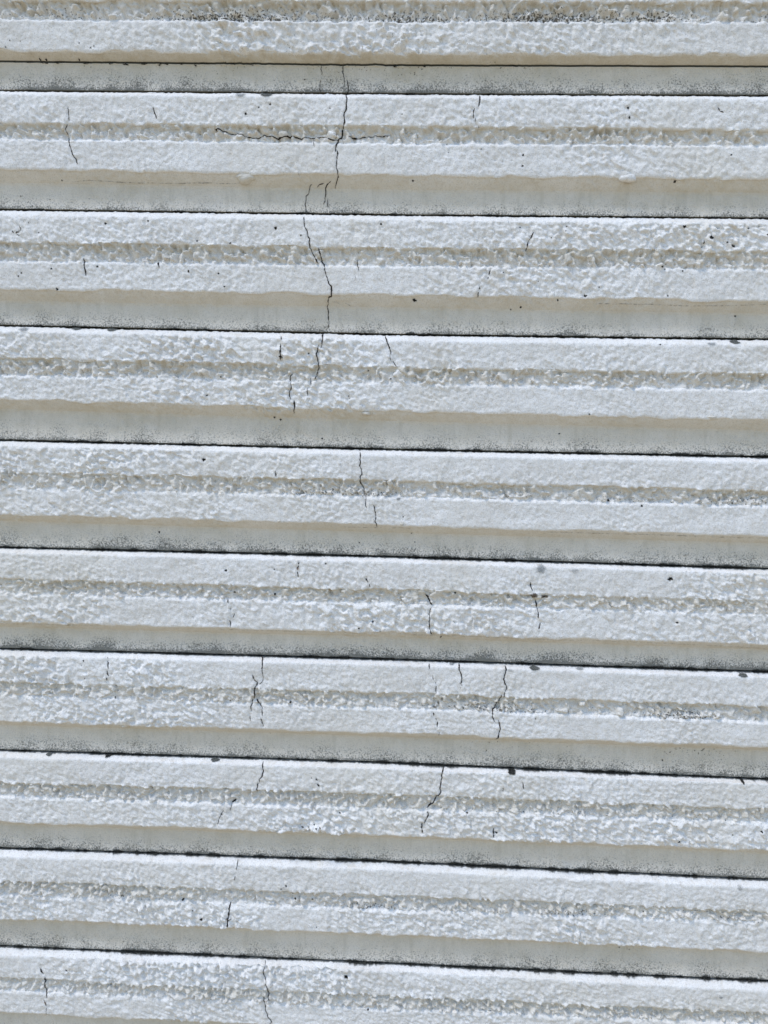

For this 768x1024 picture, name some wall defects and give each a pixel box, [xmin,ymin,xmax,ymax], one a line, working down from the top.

crack [215,66,385,412]
crack [358,449,377,526]
crack [250,655,263,724]
crack [486,666,507,751]
crack [421,767,444,833]